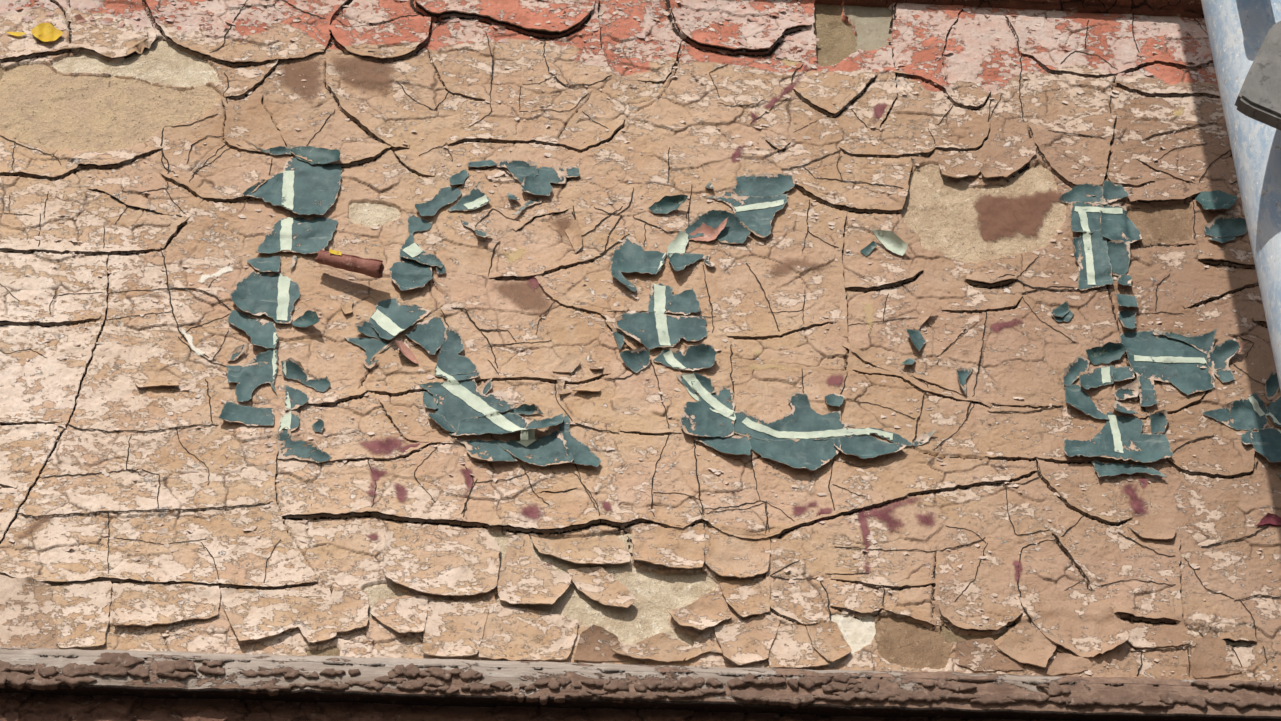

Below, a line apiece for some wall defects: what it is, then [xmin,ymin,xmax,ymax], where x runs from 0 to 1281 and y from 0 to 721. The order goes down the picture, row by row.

flaking render [0,39,221,153]
crack [116,250,231,366]
peeling [218,142,601,467]
crack [358,304,634,421]
crack [475,187,647,350]
peeling [610,173,936,471]
crack [727,2,1080,457]
flaking render [902,163,1247,477]
crack [999,14,1259,314]
flaking render [495,533,718,647]
flaking render [826,614,1008,669]
crack [830,525,1022,632]